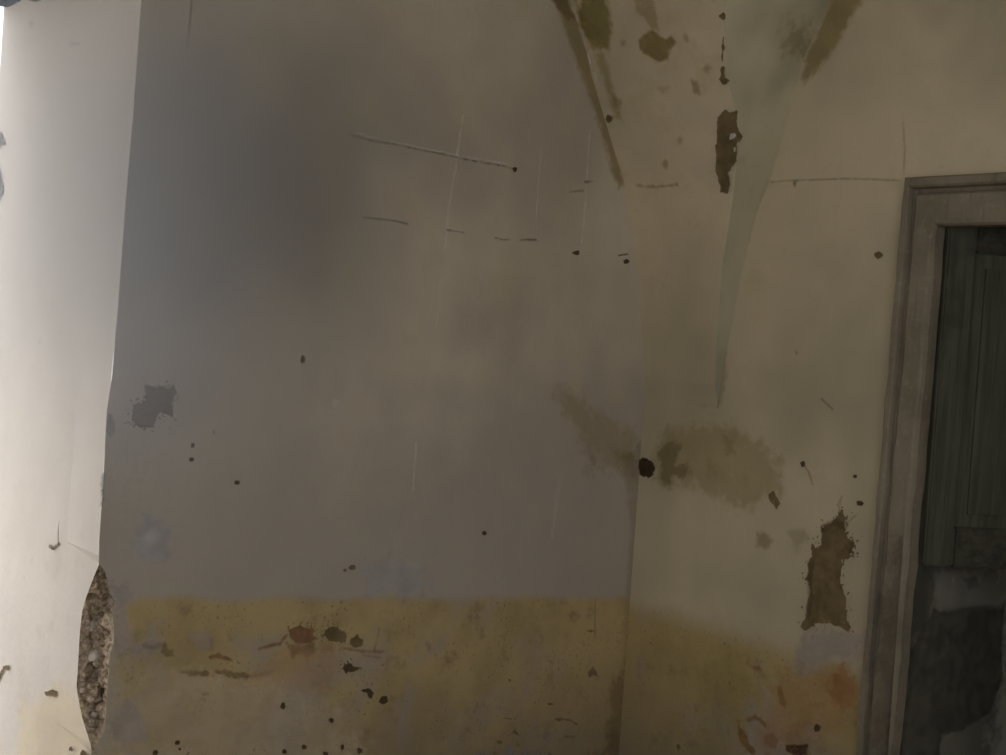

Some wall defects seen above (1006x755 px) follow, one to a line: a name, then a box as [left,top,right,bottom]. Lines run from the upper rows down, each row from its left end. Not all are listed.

leakage [639,31,675,61]
peeling [715,110,743,194]
peeling [107,376,179,435]
peeling [798,507,859,640]
spalling [69,565,115,755]